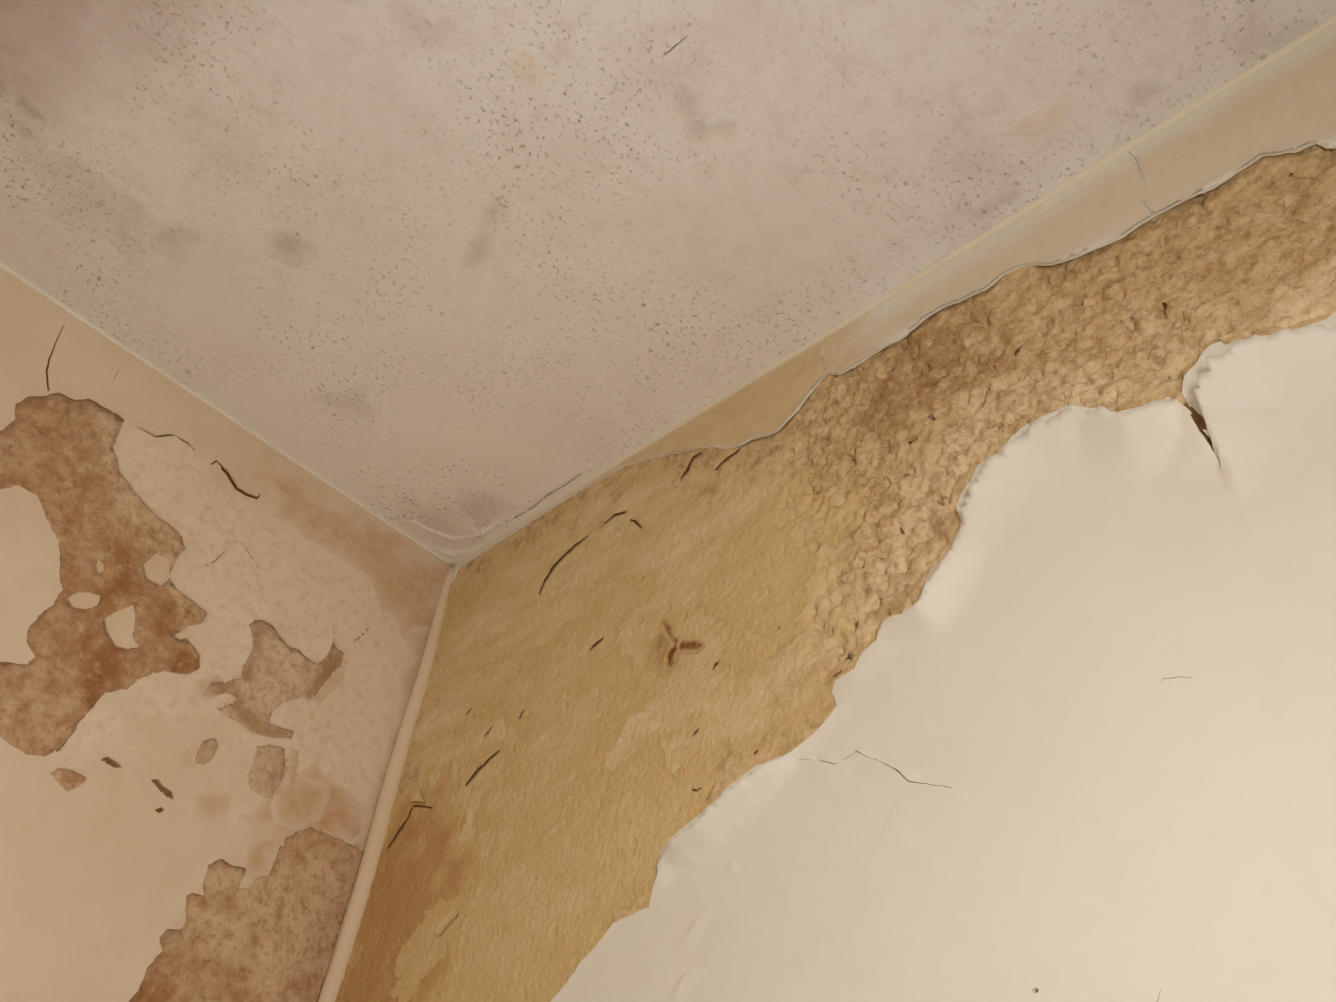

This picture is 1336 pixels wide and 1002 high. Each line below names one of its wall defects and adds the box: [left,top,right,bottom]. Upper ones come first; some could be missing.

damp [1213,0,1336,69]
crack [46,325,64,391]
flaking render [451,143,1336,582]
crack [144,431,260,499]
crack [1183,402,1215,453]
spalling [0,392,207,757]
crack [539,511,641,594]
damp [335,35,1336,1002]
flaking render [873,573,923,619]
peeling [203,620,344,798]
crack [465,750,499,785]
spalling [129,827,363,1002]